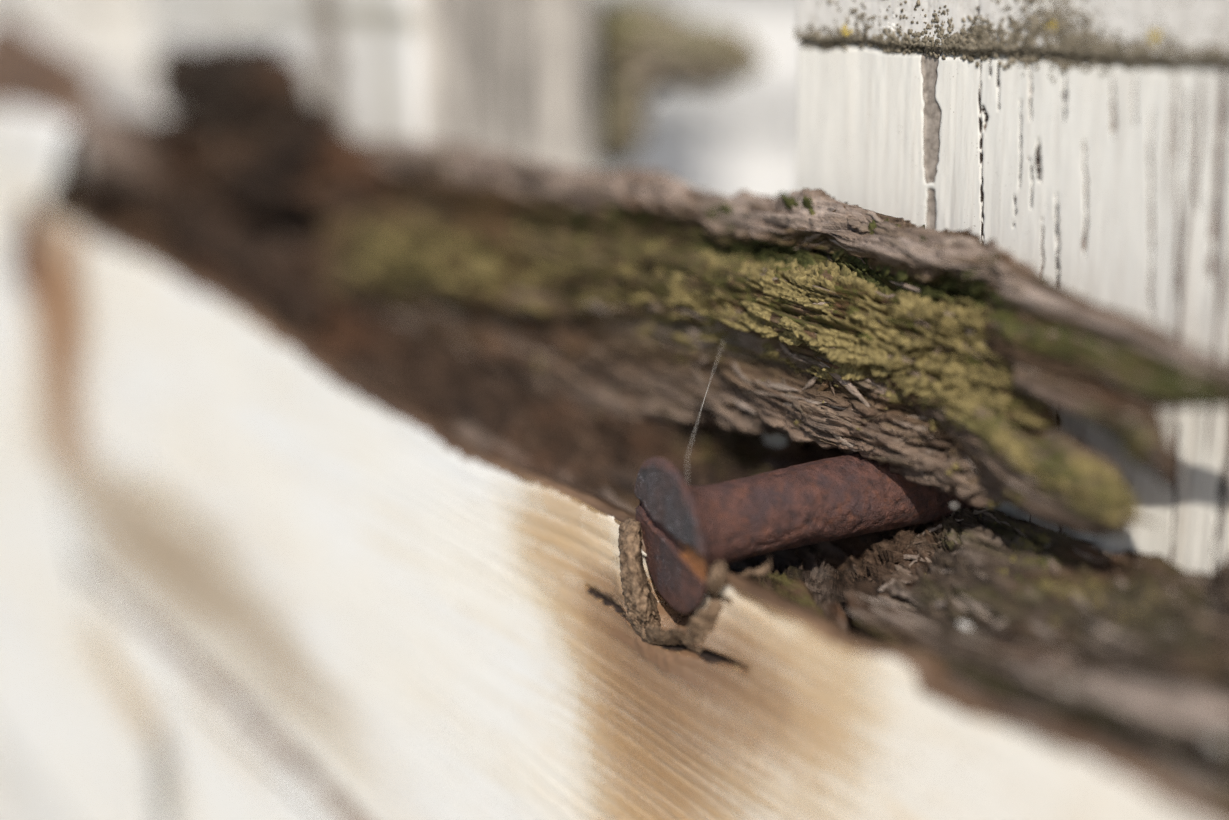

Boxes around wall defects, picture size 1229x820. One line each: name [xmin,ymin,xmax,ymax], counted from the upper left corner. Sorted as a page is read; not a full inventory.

peeling [921,46,941,230]
crack [978,58,1088,285]
crack [1109,81,1117,138]
crack [1148,72,1229,320]
peeling [621,550,723,654]
crack [1211,461,1229,559]